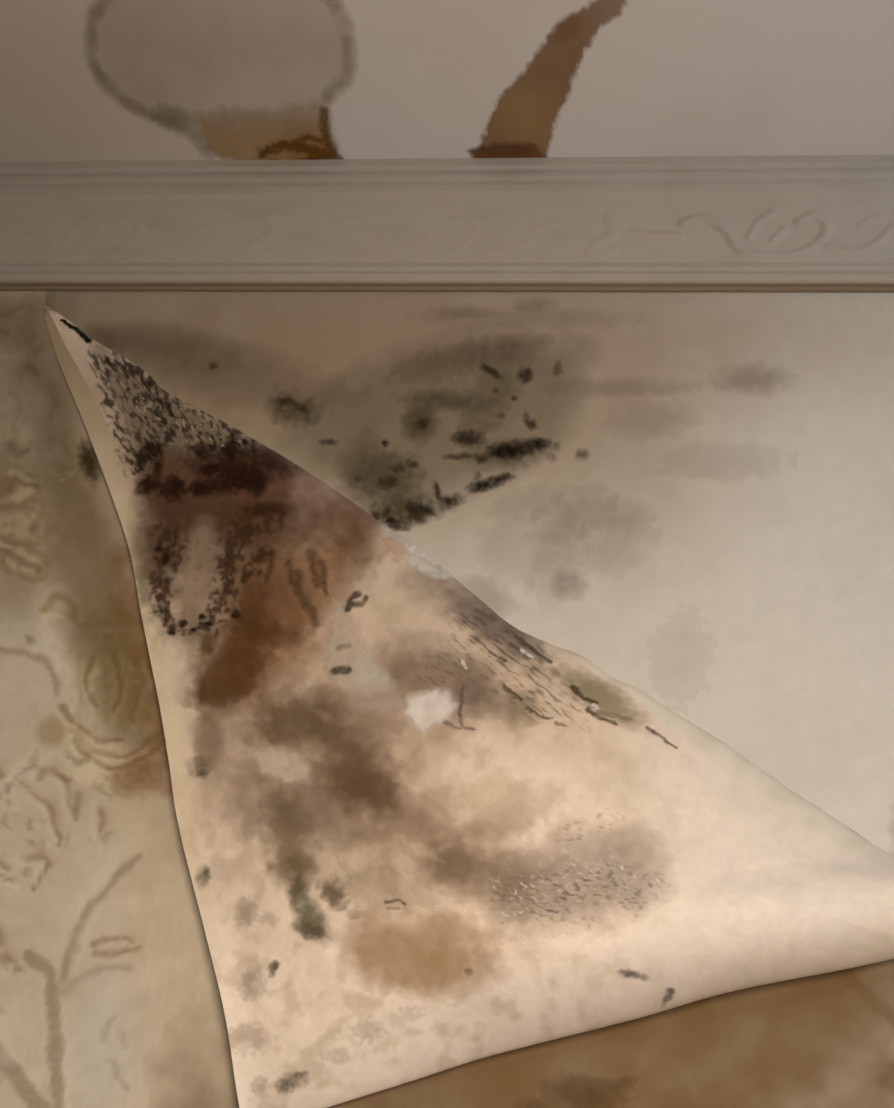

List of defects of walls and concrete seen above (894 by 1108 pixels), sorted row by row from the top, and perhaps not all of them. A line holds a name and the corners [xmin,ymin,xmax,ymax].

damp [203,109,343,160]
damp [60,319,259,478]
damp [449,421,545,463]
damp [361,461,458,530]
damp [471,474,509,492]
damp [150,507,284,635]
peeling [329,601,392,709]
peeling [405,690,455,732]
peeling [256,747,308,782]
peeling [313,854,346,882]
damp [295,888,323,935]
damp [356,929,468,987]